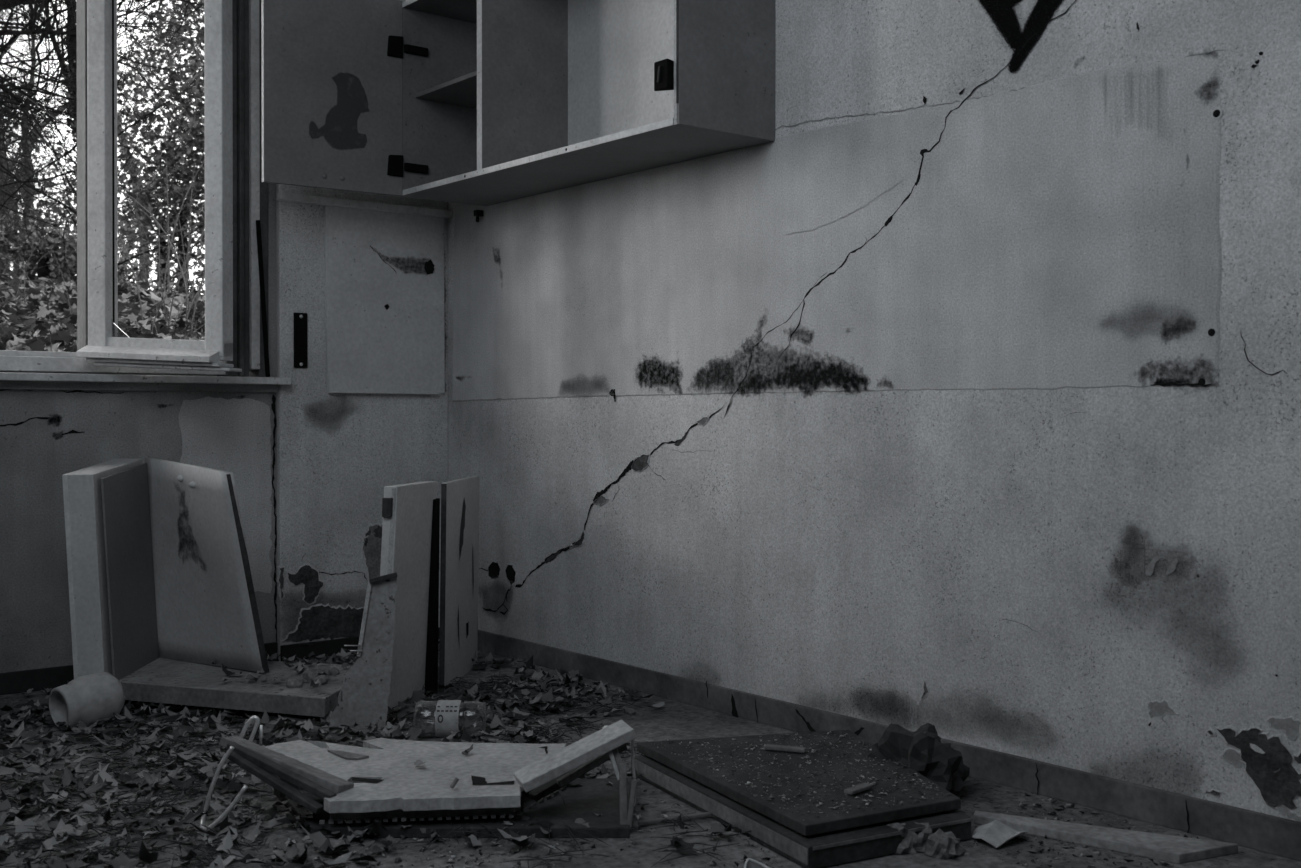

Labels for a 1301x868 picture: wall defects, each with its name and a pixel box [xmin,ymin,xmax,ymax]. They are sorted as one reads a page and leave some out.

leakage [637,320,893,395]
crack [515,0,1076,587]
leakage [1146,317,1195,339]
leakage [1141,360,1213,387]
crack [1241,335,1286,376]
flaking render [361,522,383,581]
flaking render [276,563,364,644]
flaking render [1207,715,1301,822]